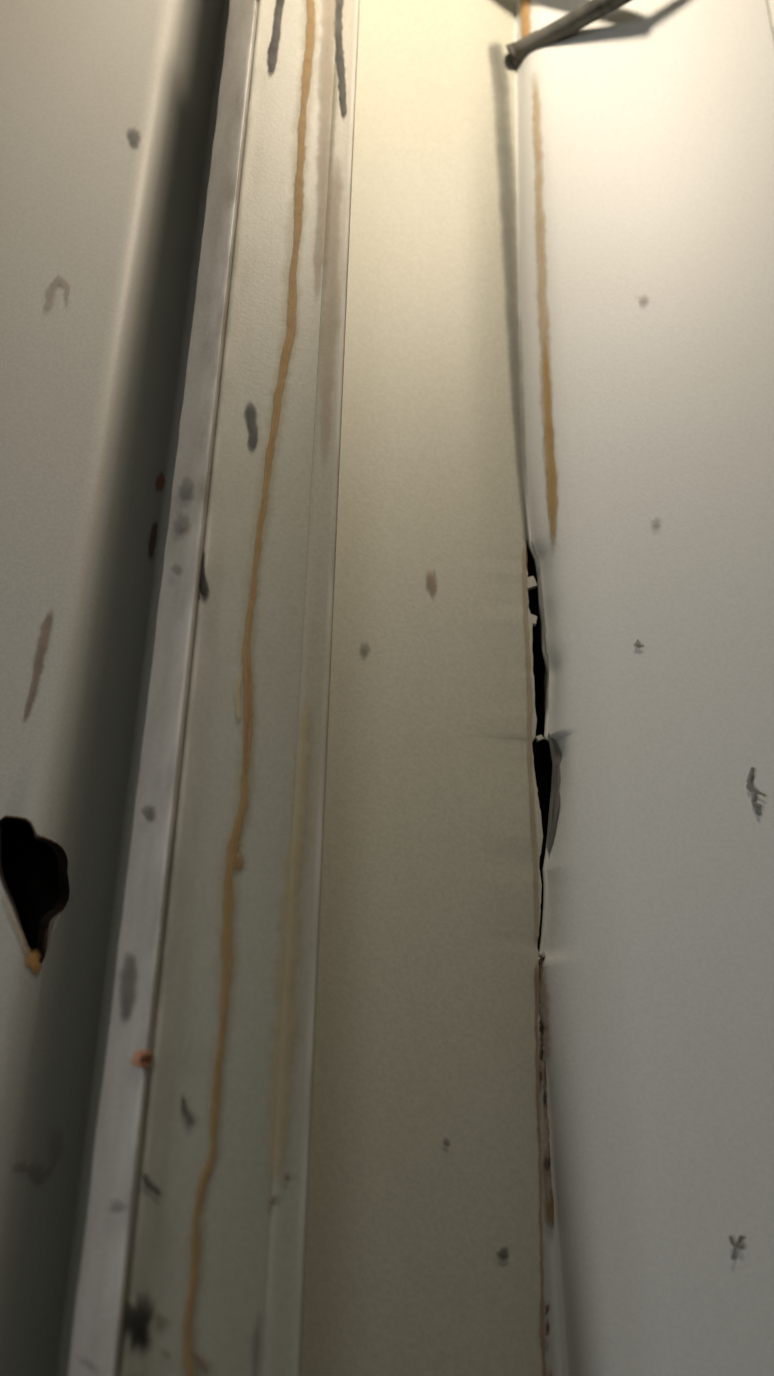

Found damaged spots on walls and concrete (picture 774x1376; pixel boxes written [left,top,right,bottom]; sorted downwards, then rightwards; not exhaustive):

leakage [259,0,285,73]
leakage [334,0,347,115]
corrosion [520,0,530,37]
corrosion [534,92,557,536]
crack [494,47,562,953]
hole [1,820,60,952]
mould [124,1300,152,1346]